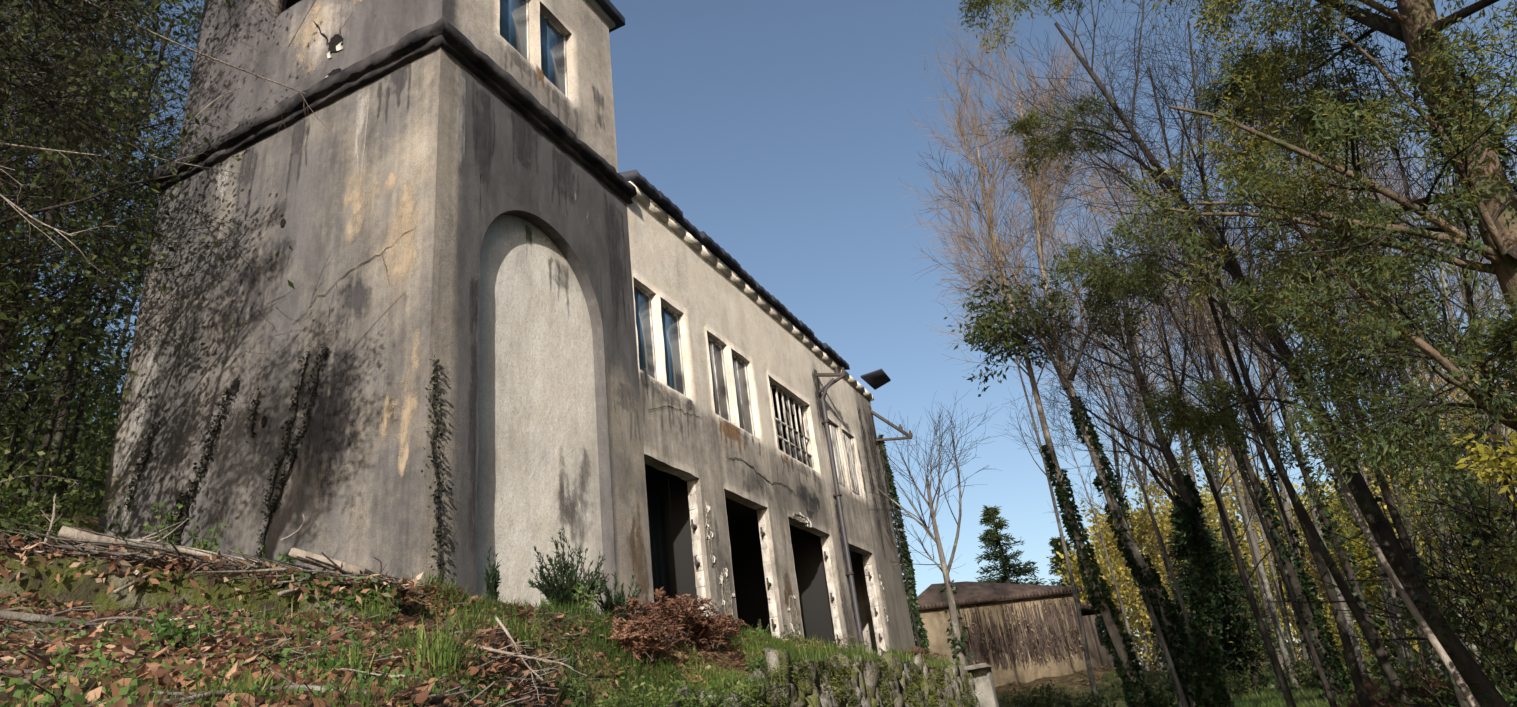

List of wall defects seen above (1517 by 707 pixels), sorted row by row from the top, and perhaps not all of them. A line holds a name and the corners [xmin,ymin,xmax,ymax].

water stain [505,51,604,130]
water stain [272,118,309,221]
water stain [231,238,292,326]
water stain [336,278,367,323]
water stain [548,259,568,303]
water stain [130,350,156,453]
water stain [301,349,357,506]
water stain [614,368,695,440]
water stain [812,373,826,434]
water stain [560,450,589,539]